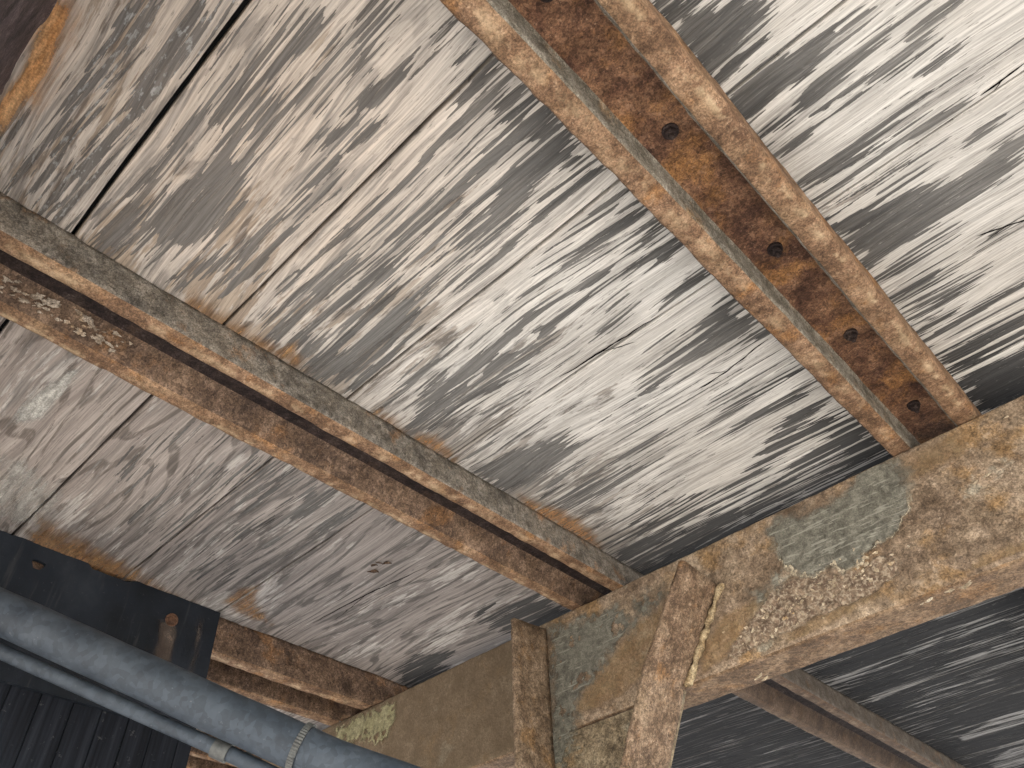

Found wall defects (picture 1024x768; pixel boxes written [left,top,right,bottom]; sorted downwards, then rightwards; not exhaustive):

rust [0,0,69,127]
peeling [0,275,133,352]
peeling [454,294,911,602]
rust [31,524,160,590]
rust [726,548,900,658]